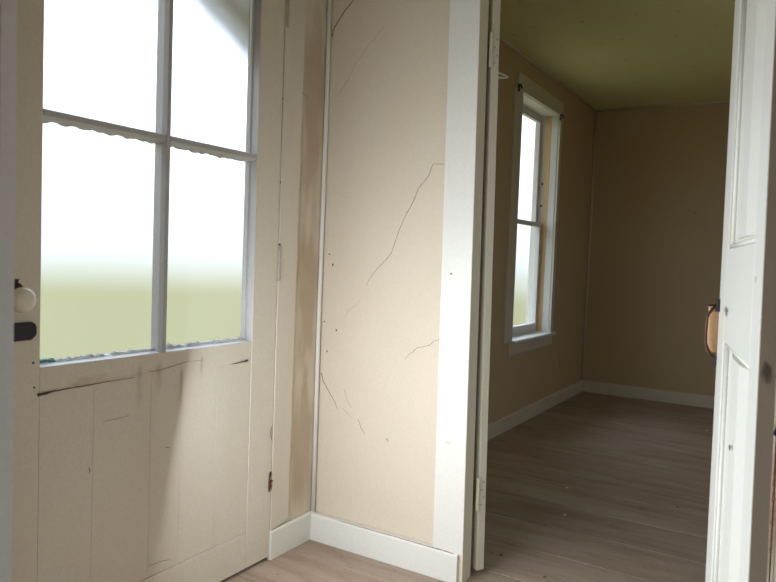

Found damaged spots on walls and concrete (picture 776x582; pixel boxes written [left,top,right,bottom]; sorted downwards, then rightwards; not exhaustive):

crack [345,164,441,316]